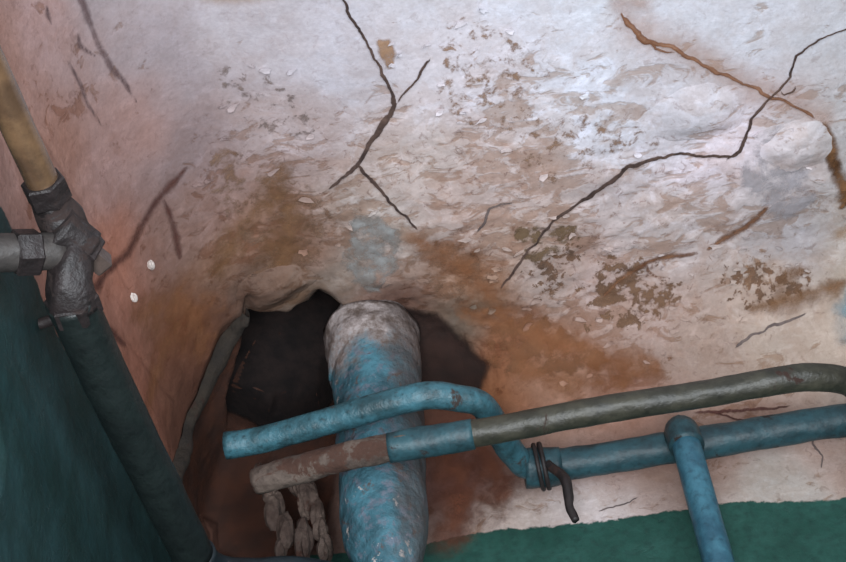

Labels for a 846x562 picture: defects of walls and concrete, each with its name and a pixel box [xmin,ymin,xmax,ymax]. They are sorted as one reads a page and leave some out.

peeling [192,137,245,204]
peeling [248,64,309,121]
crack [329,0,430,229]
peeling [377,40,402,68]
peeling [437,44,526,131]
peeling [547,115,590,150]
crack [501,13,846,296]
corrosion [823,124,846,209]
peeling [345,210,400,291]
peeling [708,237,814,322]
crack [736,314,805,347]
spalling [173,289,340,558]